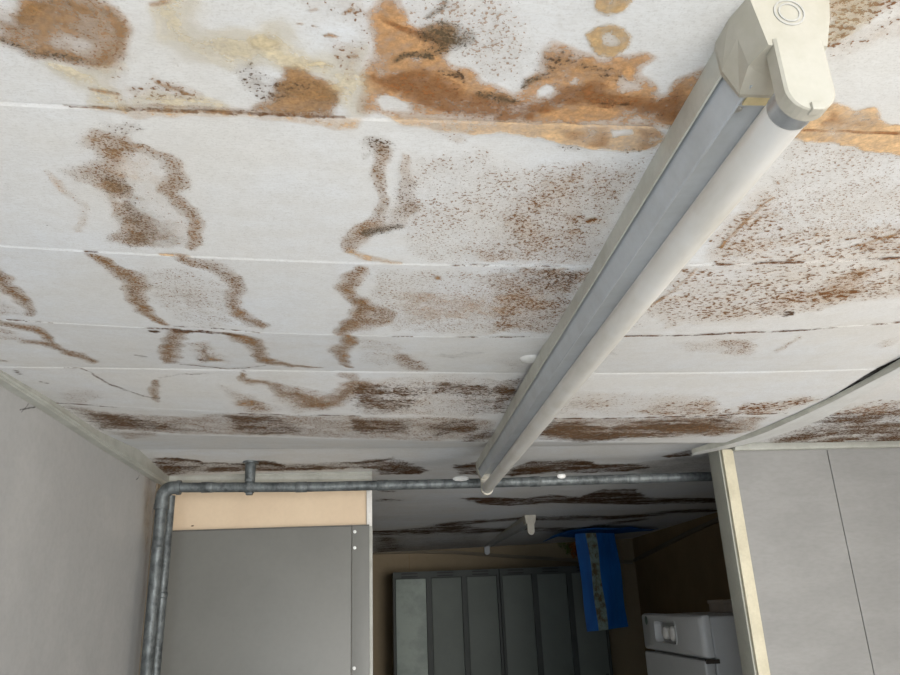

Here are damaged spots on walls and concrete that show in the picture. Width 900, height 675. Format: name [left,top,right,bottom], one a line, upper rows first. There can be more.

leakage [0,0,130,78]
leakage [58,0,701,442]
leakage [624,104,900,355]
leakage [0,274,96,364]
crack [64,367,160,400]
leakage [539,393,819,443]
leakage [770,400,900,443]
leakage [153,457,245,475]
leakage [256,457,425,475]
leakage [506,459,647,477]